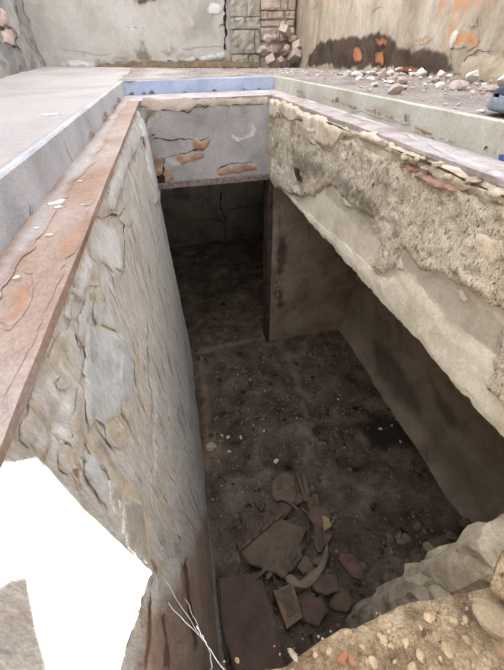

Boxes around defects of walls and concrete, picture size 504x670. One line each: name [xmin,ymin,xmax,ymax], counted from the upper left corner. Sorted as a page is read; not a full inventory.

flaking render [0,8,15,45]
crack [219,0,227,50]
rust [0,165,107,408]
damp [271,197,305,337]
spalling [138,97,504,437]